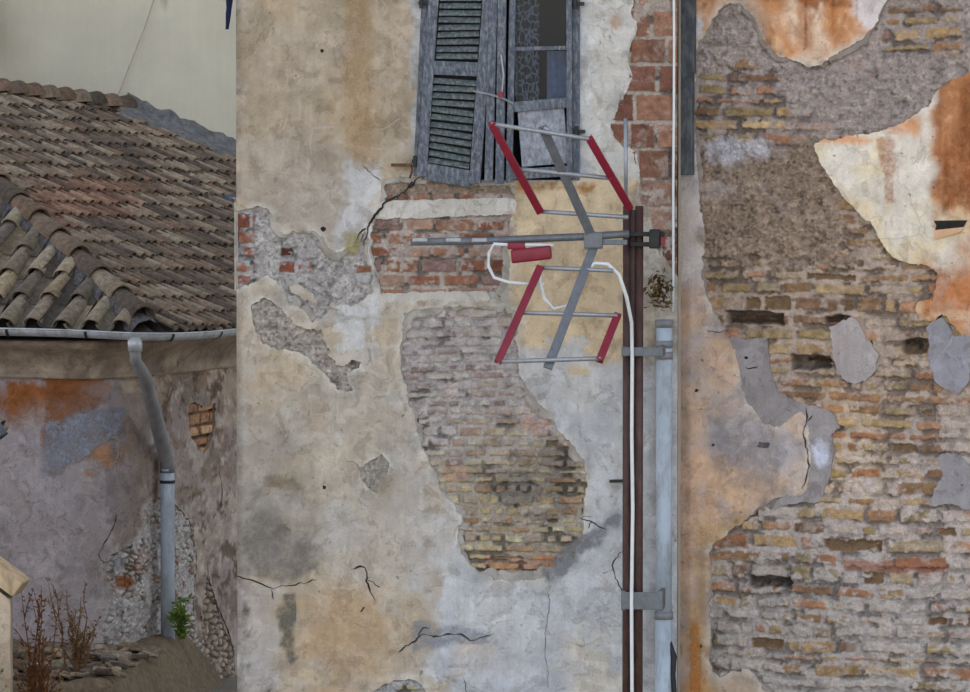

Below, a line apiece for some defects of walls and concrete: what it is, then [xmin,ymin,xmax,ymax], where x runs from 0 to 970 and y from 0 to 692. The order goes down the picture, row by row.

flaking render [611,0,678,275]
crack [357,166,421,241]
flaking render [234,176,588,582]
flaking render [694,0,970,692]
flaking render [188,403,213,452]
flaking render [100,496,161,645]
flaking render [175,506,235,679]
crack [234,574,318,599]
crack [354,565,379,612]
crack [399,627,492,652]
flaking render [373,679,426,692]